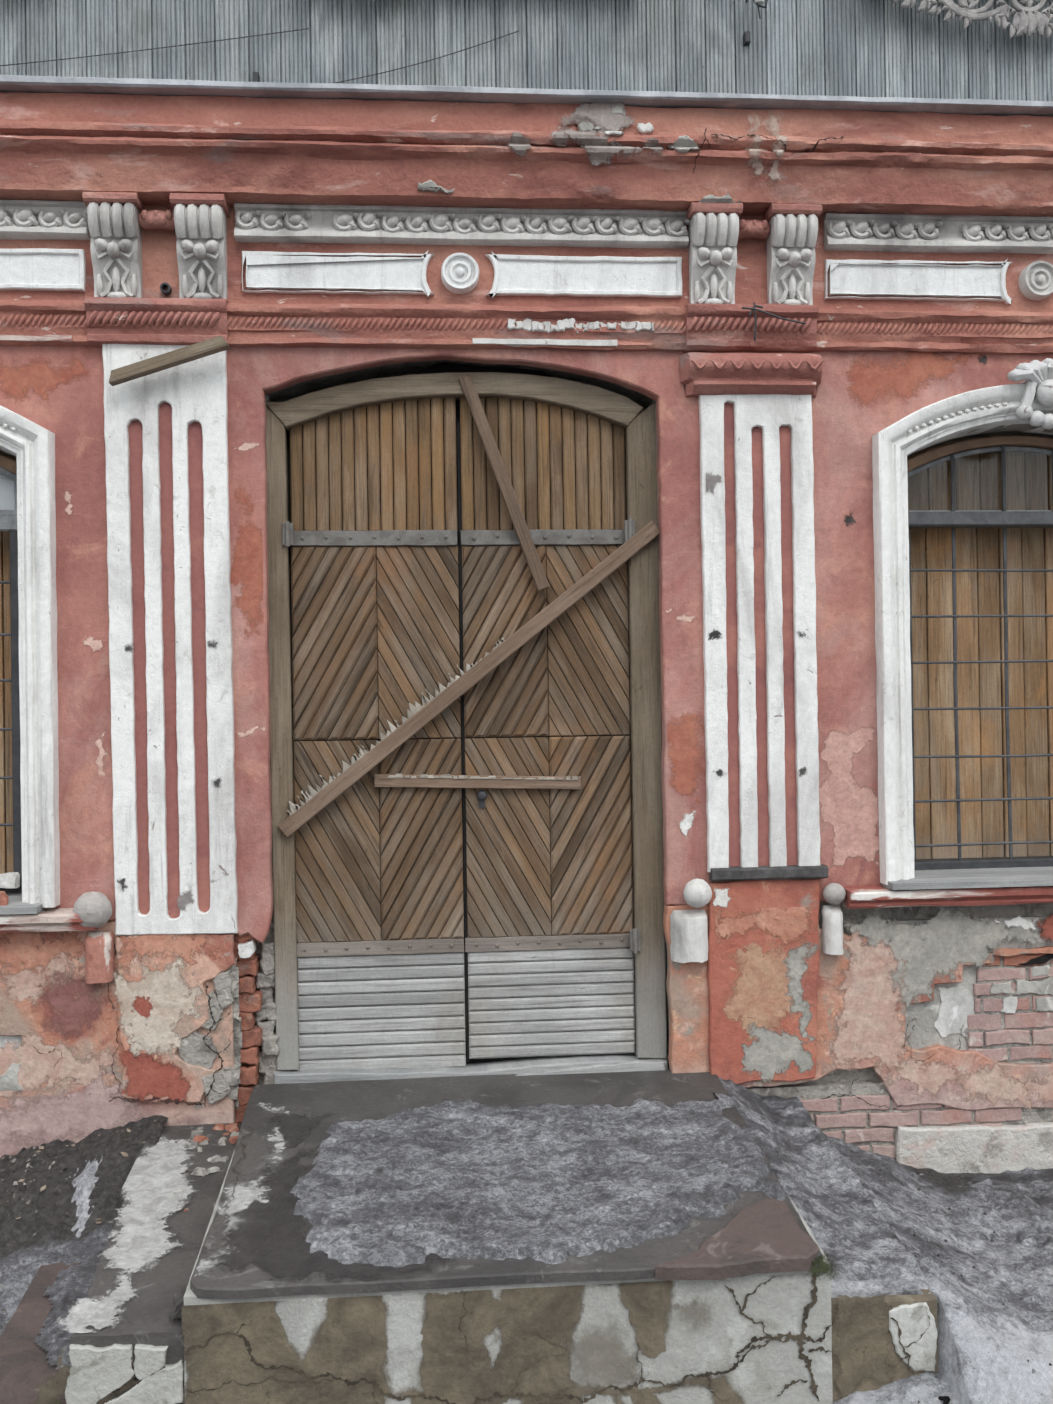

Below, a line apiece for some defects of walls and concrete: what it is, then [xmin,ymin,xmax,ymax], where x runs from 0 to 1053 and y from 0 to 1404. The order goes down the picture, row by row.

peeling [508,132,531,157]
peeling [551,102,663,166]
peeling [472,318,655,347]
peeling [0,931,242,1110]
spalling [713,888,1053,1111]
crack [97,1274,832,1404]